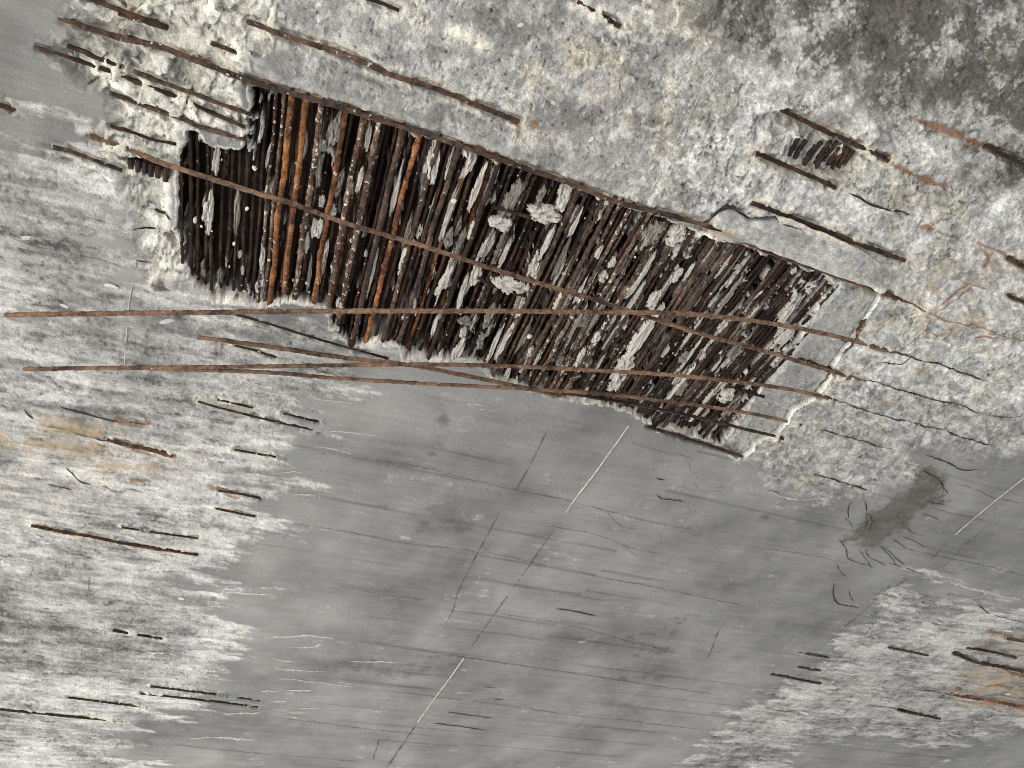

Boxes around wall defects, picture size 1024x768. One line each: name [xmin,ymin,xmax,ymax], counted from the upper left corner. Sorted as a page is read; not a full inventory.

corrosion [86,0,169,30]
corrosion [914,119,1024,168]
corrosion [4,17,906,458]
peeling [63,0,1024,510]
crack [709,207,802,230]
crack [848,193,909,215]
peeling [0,28,625,768]
corrosion [31,524,198,556]
leakage [840,463,953,555]
crack [815,455,1019,608]
corrosion [948,647,1024,709]